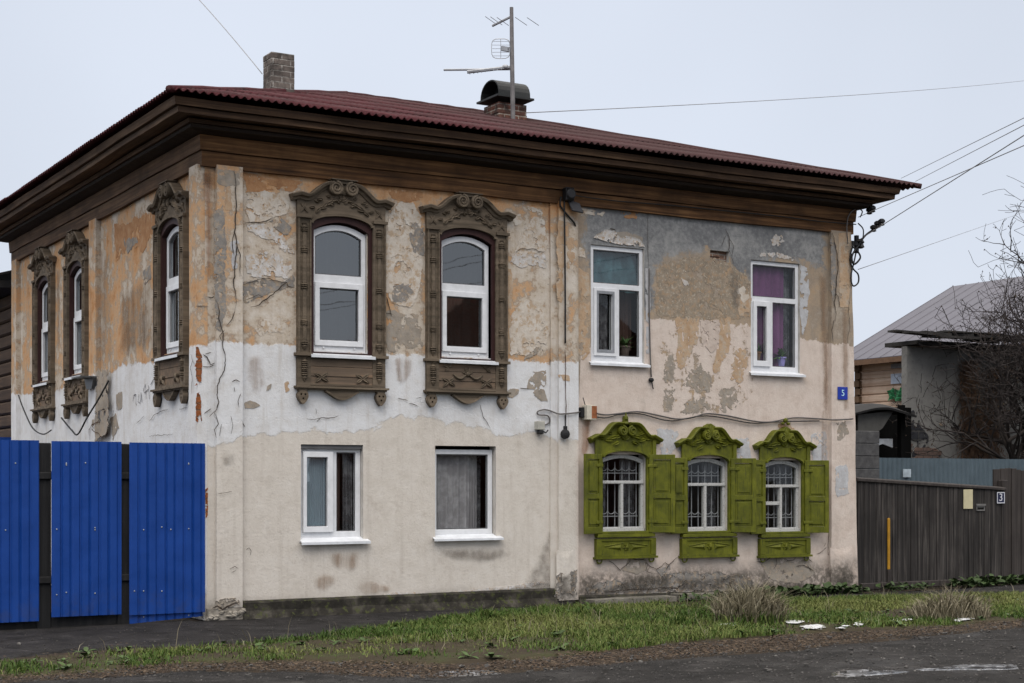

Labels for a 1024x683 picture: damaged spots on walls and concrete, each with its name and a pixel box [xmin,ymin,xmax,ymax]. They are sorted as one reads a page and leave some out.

peeling [114,212,155,261]
crack [89,172,295,442]
peeling [213,169,302,332]
peeling [507,370,570,401]
peeling [508,206,591,360]
peeling [654,251,752,415]
peeling [760,234,810,335]
spalling [214,598,240,611]